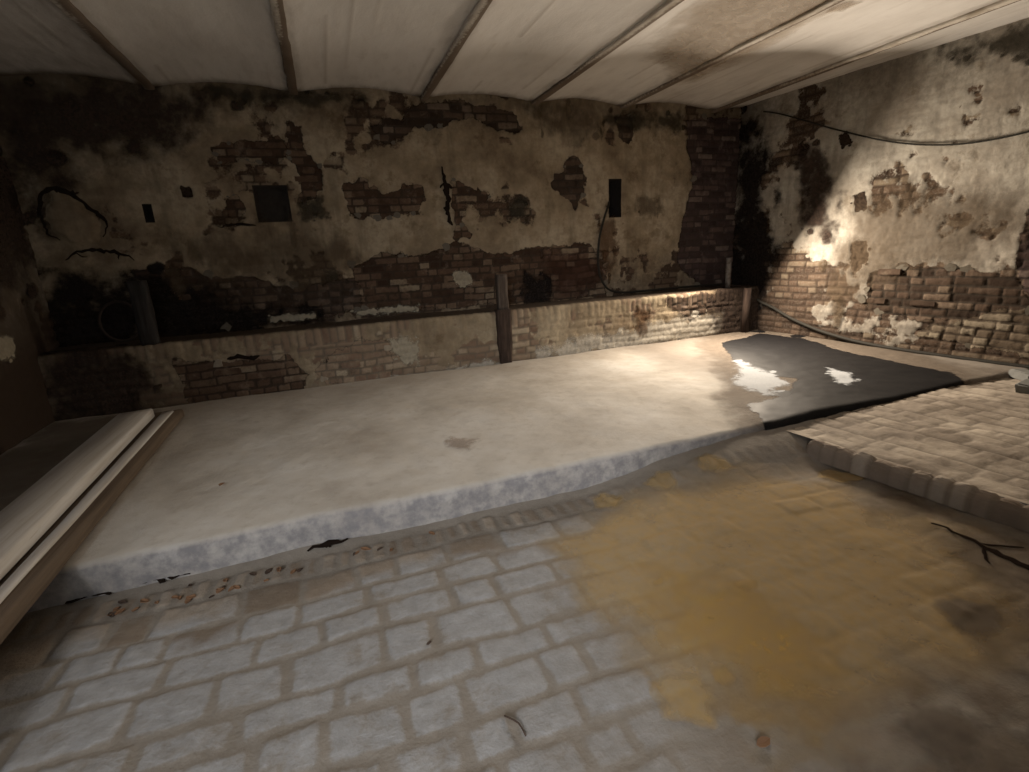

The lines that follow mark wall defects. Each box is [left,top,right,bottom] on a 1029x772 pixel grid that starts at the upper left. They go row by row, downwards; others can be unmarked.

crack [37,186,134,260]
leakage [0,76,367,299]
flaking render [131,177,609,324]
flaking render [370,98,522,145]
crack [440,166,453,226]
flaking render [551,156,587,211]
flaking render [665,113,742,324]
leakage [794,139,1008,326]
flaking render [851,209,1029,358]
leakage [536,311,969,430]
leakage [559,470,1029,725]
crack [931,522,1029,570]